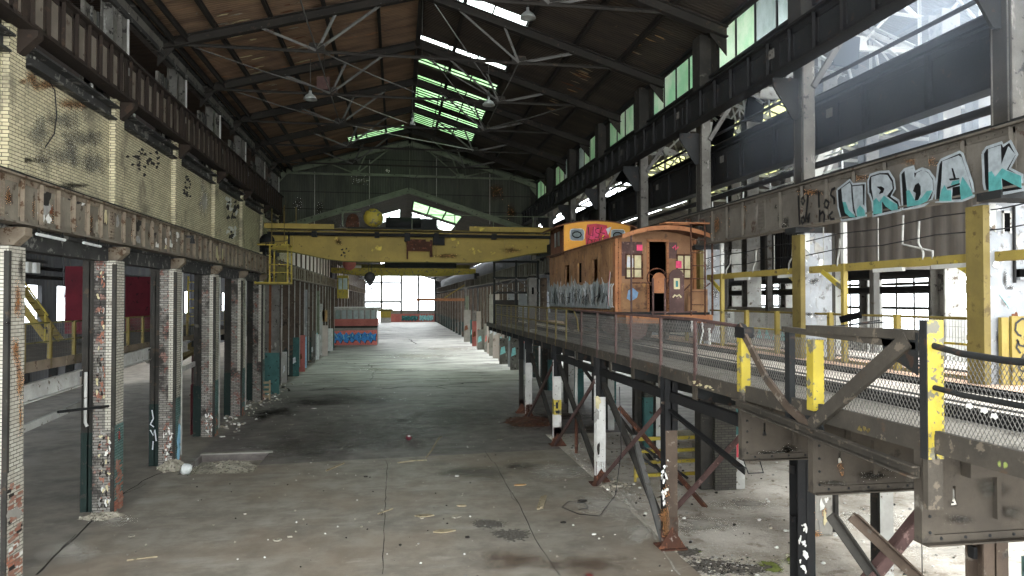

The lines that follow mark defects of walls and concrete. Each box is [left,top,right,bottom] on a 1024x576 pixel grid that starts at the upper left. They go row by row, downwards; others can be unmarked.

spalling [96,264,106,399]
spalling [7,482,23,576]
peeling [97,430,124,511]
crack [485,451,560,575]